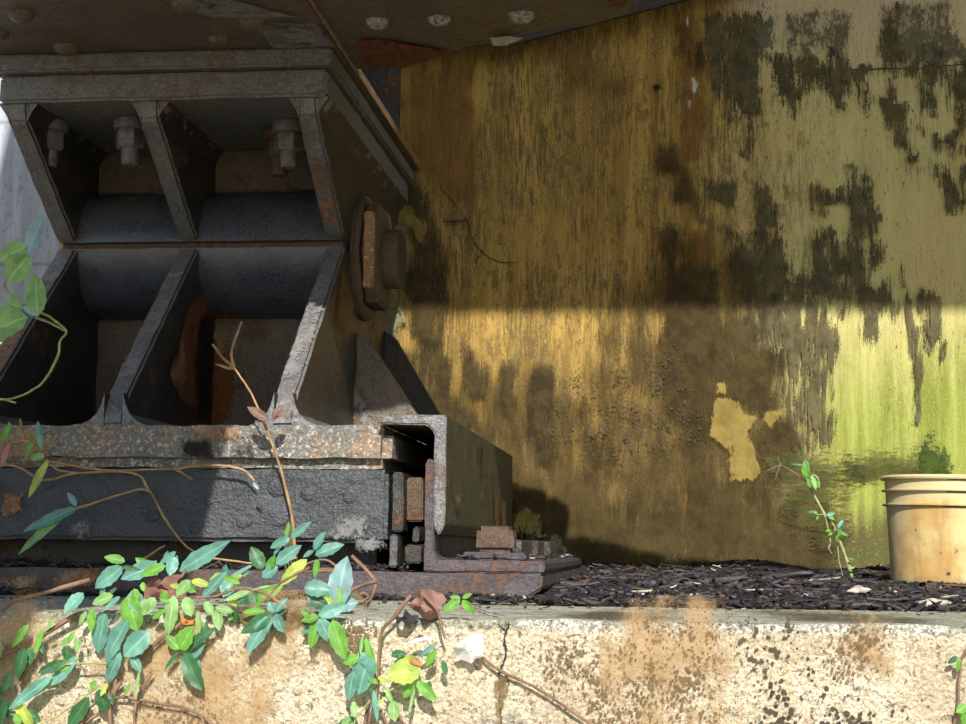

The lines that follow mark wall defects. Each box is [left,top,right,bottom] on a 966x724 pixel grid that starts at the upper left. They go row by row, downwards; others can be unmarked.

leakage [687,0,966,216]
crack [442,190,516,269]
leakage [397,146,949,570]
peeling [710,382,783,482]
crack [461,605,510,724]